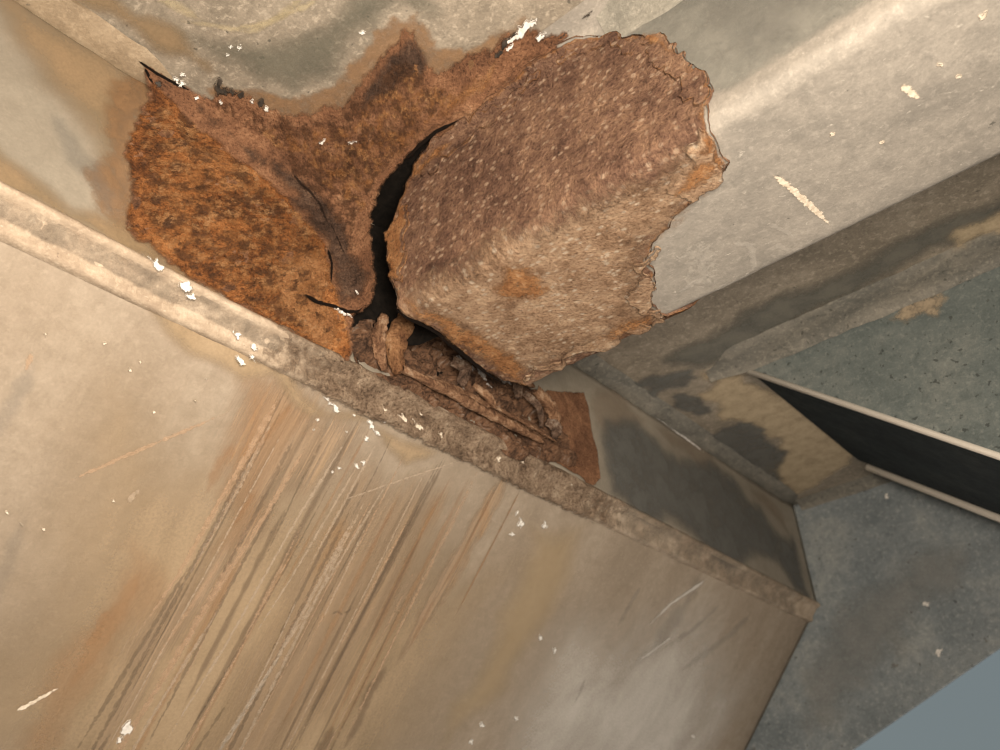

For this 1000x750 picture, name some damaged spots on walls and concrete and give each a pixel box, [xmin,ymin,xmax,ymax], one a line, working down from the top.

rust [0,19,625,750]
crack [294,121,507,386]